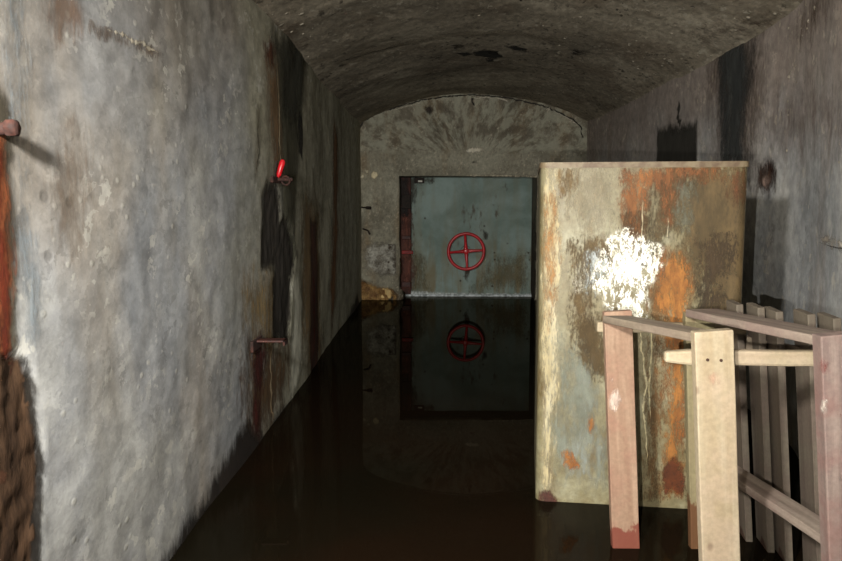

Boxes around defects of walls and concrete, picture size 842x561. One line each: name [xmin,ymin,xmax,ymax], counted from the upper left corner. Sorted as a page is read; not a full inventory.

damp [714,43,757,161]
peeling [572,228,663,319]
corrosion [541,167,747,383]
corrosion [240,334,289,442]
corrosion [561,450,580,469]
corrosion [642,334,687,502]